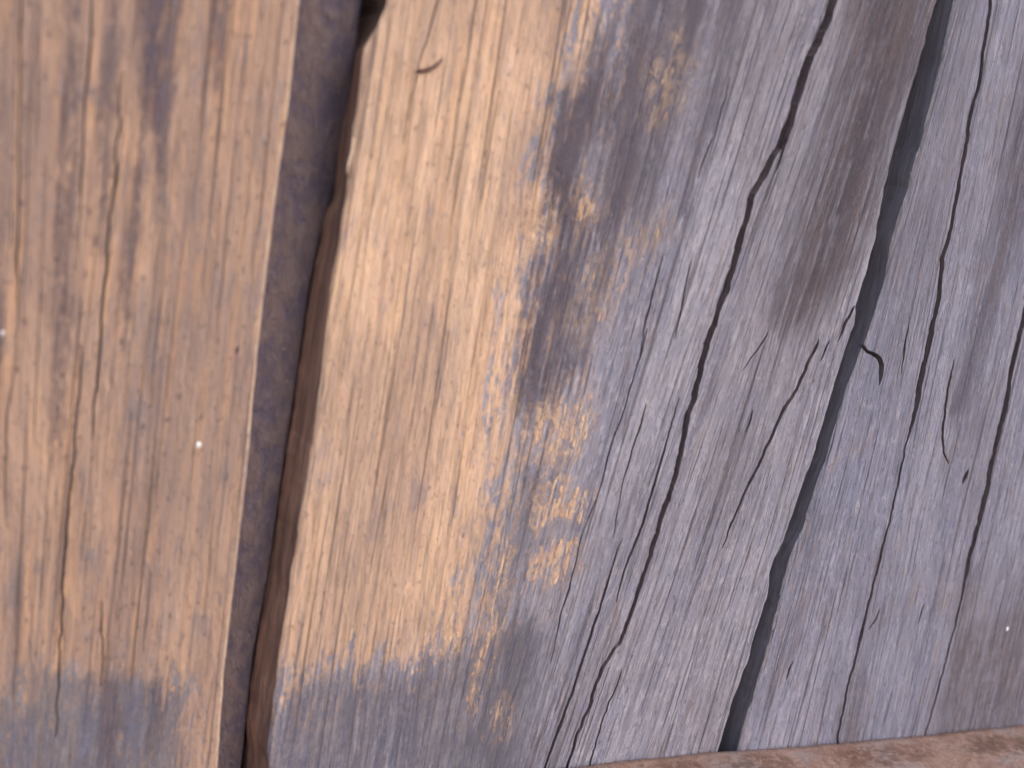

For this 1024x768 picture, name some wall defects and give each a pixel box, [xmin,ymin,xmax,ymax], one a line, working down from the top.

crack [403,0,438,144]
crack [544,0,837,768]
crack [722,0,992,744]
crack [924,307,1024,736]